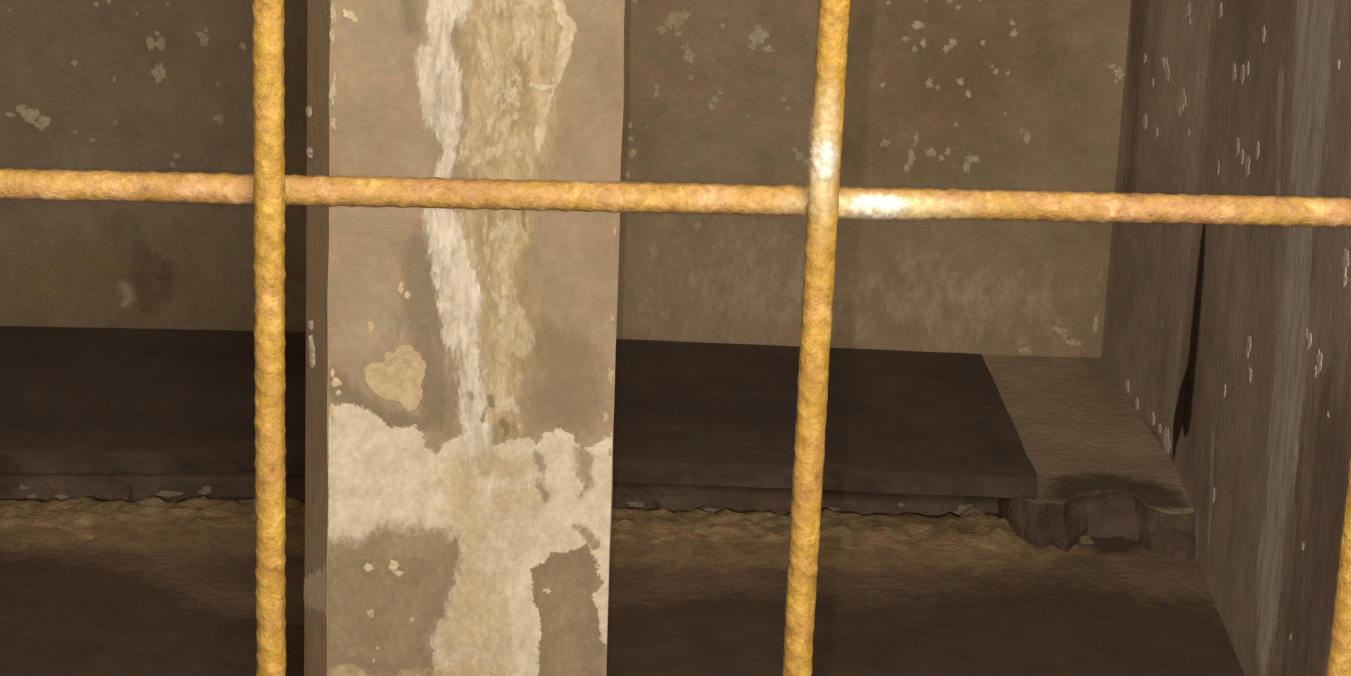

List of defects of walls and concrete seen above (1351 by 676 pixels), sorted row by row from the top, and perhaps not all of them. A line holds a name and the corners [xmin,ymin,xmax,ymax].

leakage [404,0,577,180]
spalling [308,320,316,368]
spalling [397,282,411,300]
crack [1172,224,1206,460]
peeling [327,344,644,676]